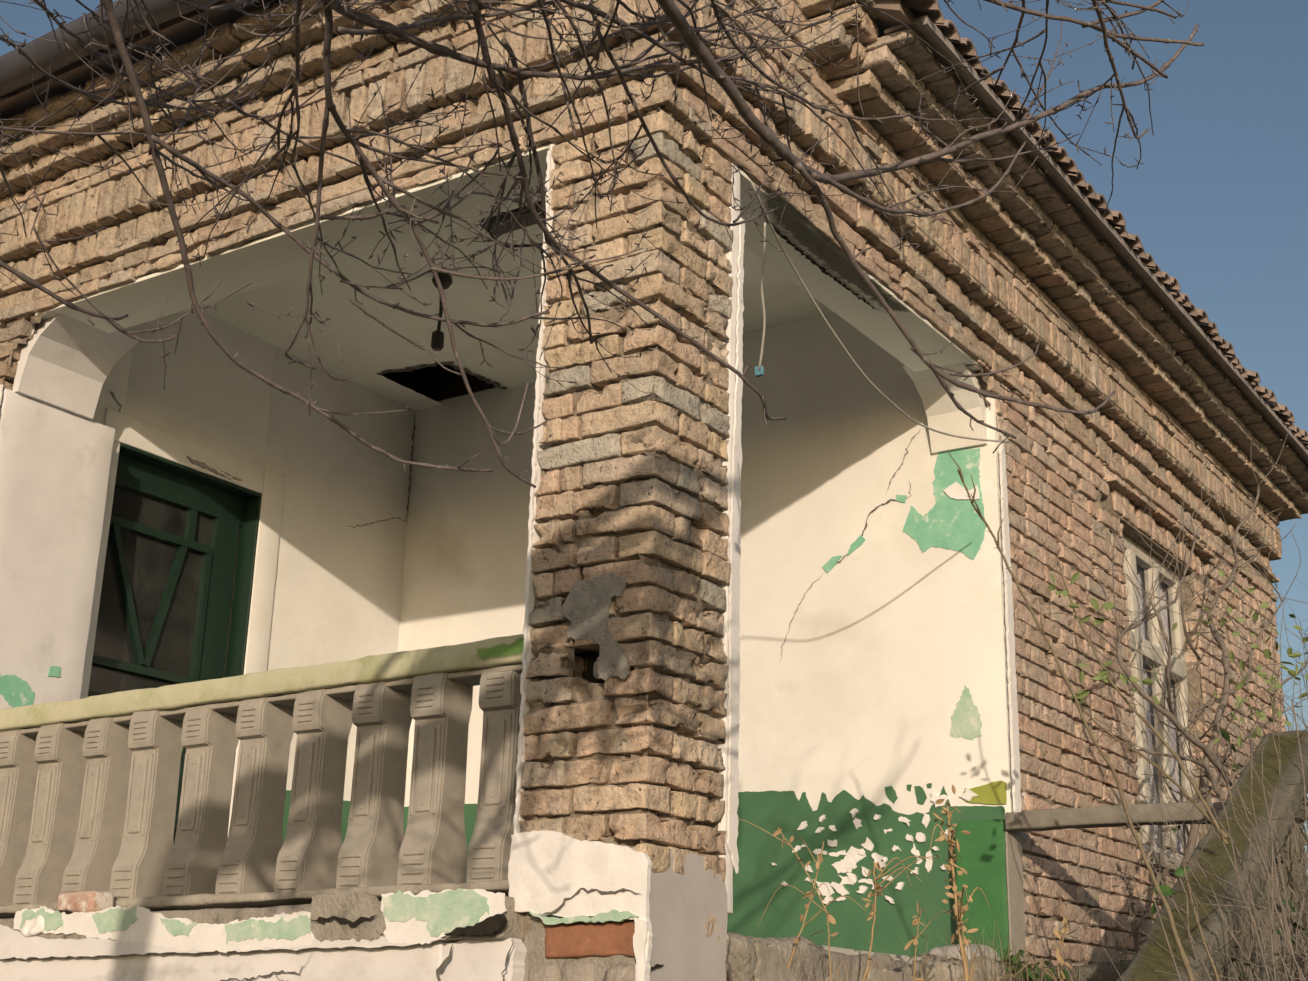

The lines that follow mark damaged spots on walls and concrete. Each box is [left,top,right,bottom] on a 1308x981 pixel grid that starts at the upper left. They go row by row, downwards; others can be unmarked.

peeling [903,448,986,560]
crack [780,429,921,660]
peeling [0,674,35,708]
peeling [48,666,61,677]
peeling [949,685,983,740]
peeling [792,780,1007,904]
peeling [14,888,508,953]
crack [538,888,642,915]
crack [436,944,453,981]
crack [501,936,514,981]